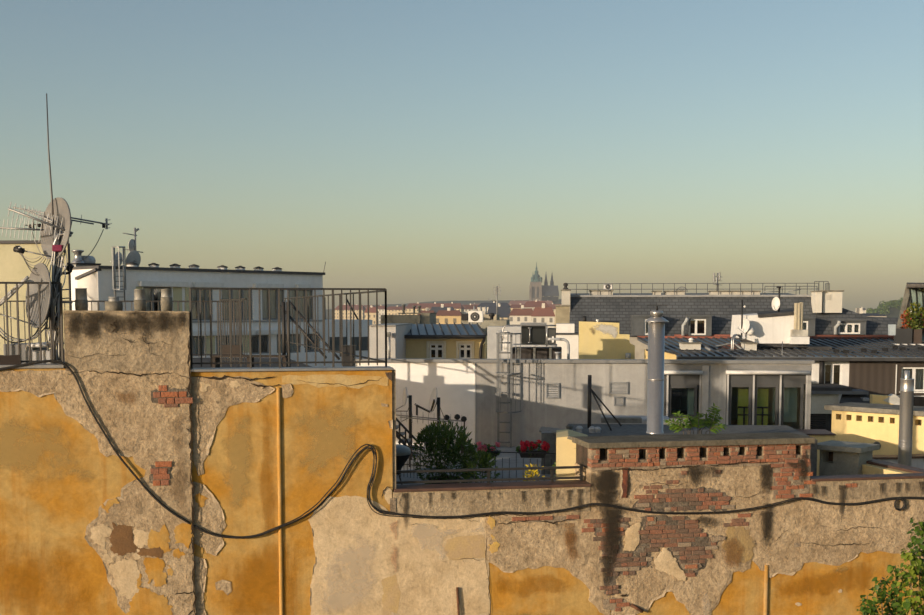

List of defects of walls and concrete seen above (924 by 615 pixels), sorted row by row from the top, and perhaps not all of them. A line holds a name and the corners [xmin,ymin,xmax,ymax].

damp [70,311,185,337]
spalling [0,369,392,615]
crack [70,316,381,615]
damp [545,470,622,583]
spalling [308,459,924,615]
damp [760,503,772,539]
damp [760,464,774,489]